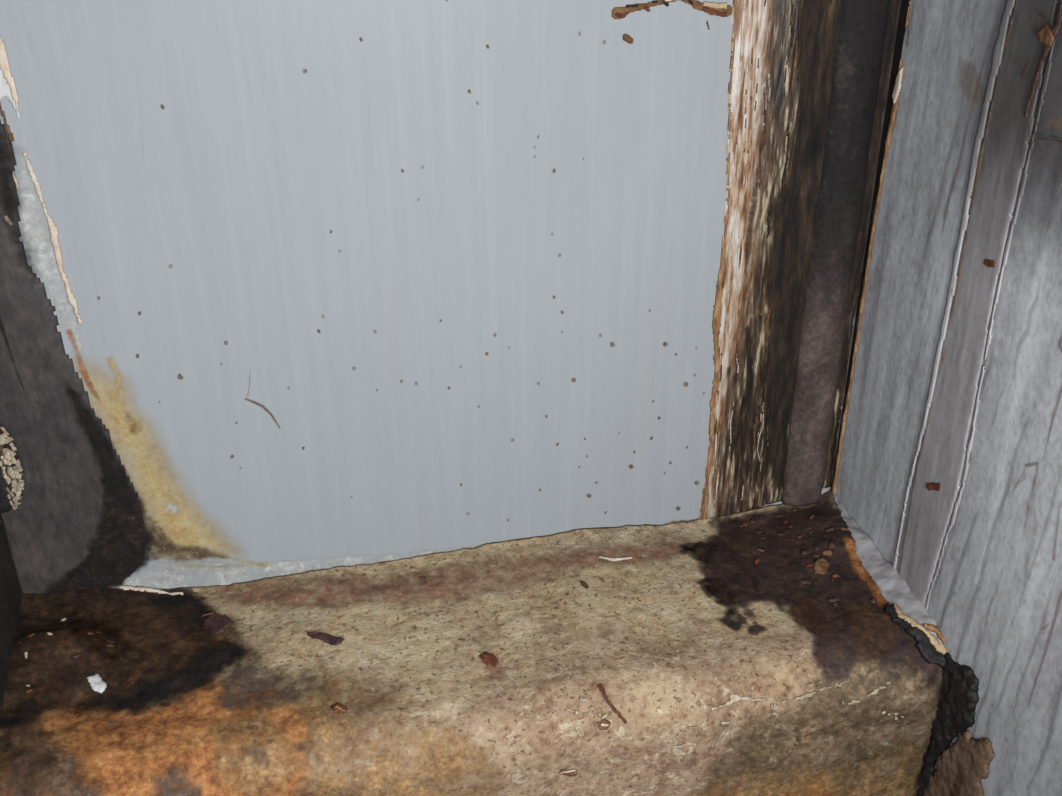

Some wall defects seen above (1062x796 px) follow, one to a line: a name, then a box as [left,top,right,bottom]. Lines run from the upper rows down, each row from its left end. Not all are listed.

peeling [0,36,20,141]
peeling [4,152,98,397]
leakage [740,0,843,493]
leakage [831,0,910,488]
leakage [0,359,322,729]